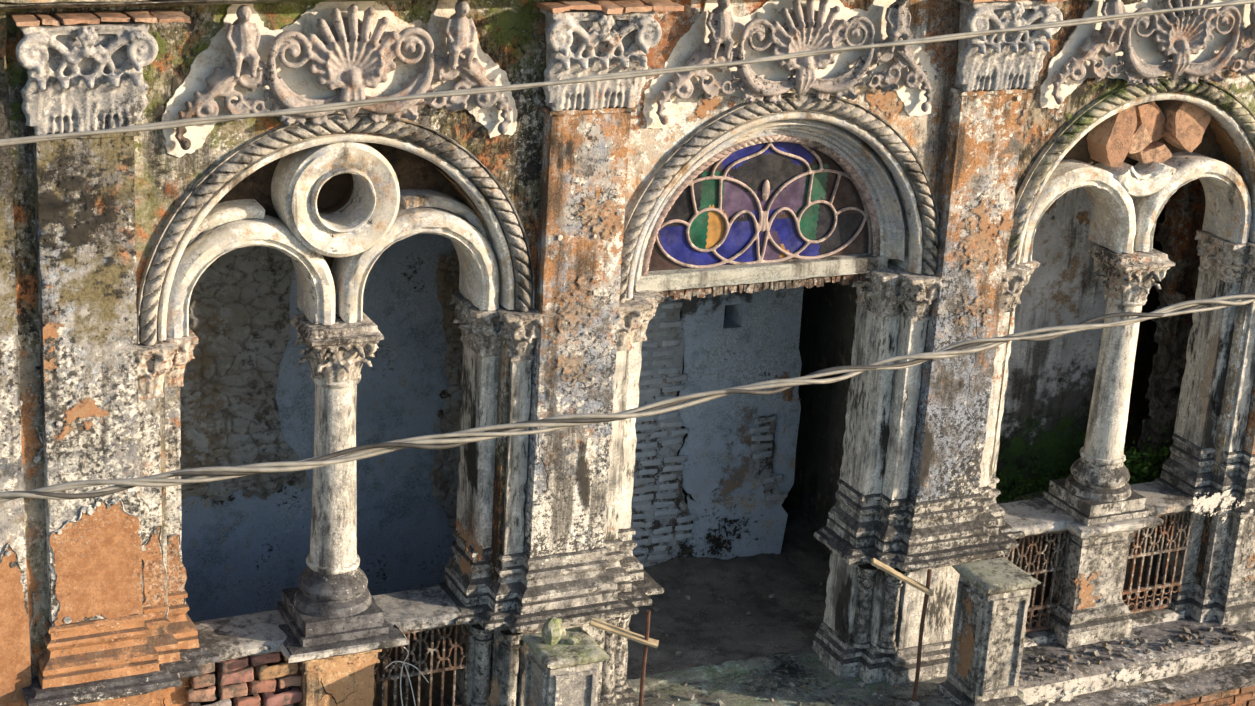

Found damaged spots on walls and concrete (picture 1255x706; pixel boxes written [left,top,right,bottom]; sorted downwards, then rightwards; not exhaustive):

flaking render [631,301,697,568]
flaking render [750,414,788,509]
flaking render [775,371,801,402]
flaking render [0,543,37,706]
flaking render [50,497,188,627]
crack [318,678,357,704]